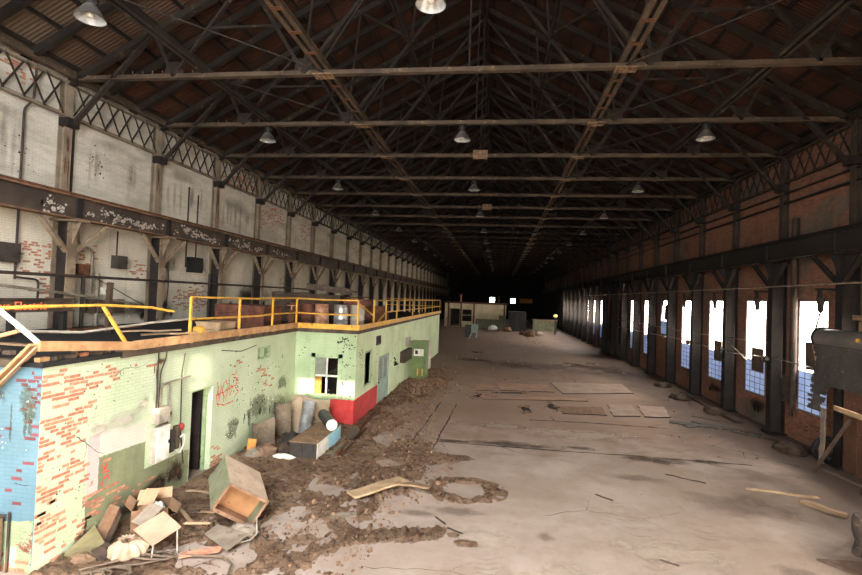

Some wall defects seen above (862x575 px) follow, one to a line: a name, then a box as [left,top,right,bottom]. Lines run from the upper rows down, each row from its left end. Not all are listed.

peeling [43,194,67,213]
peeling [86,208,165,230]
peeling [174,225,262,252]
peeling [20,241,52,298]
peeling [172,284,207,311]
peeling [5,363,157,562]